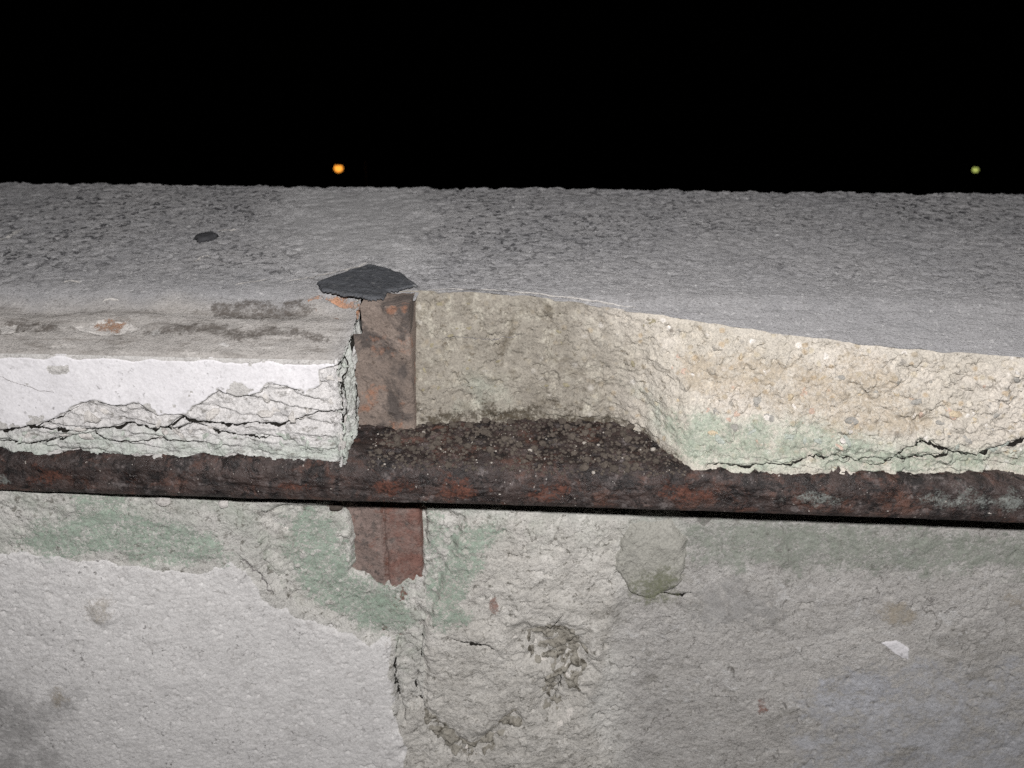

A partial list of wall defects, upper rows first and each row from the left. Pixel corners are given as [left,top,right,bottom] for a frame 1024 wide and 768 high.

crack [0,314,358,444]
spalling [0,298,362,465]
spalling [399,288,1024,475]
crack [707,438,1024,468]